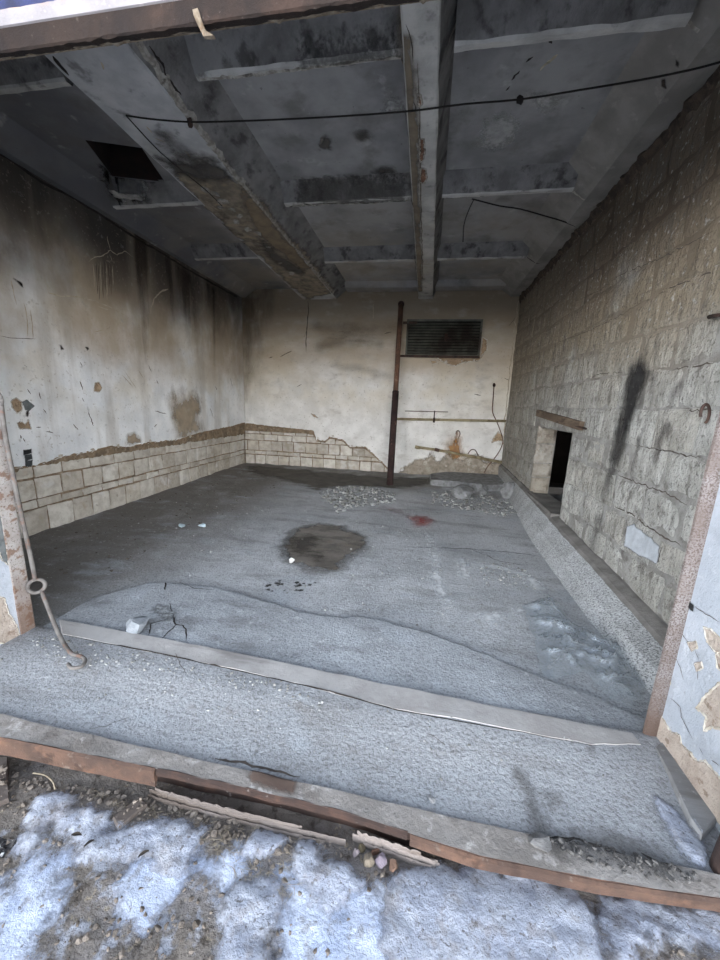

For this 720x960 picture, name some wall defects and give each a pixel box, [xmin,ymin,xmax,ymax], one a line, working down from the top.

water stain [173,395,200,437]
flaking render [11,389,388,538]
flaking render [399,453,501,475]
water stain [285,524,366,570]
crack [149,582,212,671]
flaking render [687,626,720,732]
crack [215,758,299,777]
flaking render [657,717,720,824]
crack [549,836,691,878]